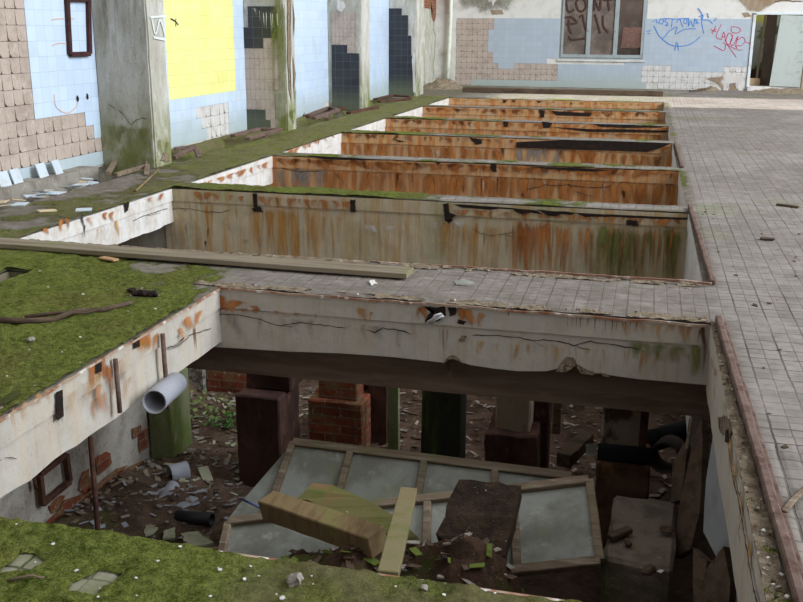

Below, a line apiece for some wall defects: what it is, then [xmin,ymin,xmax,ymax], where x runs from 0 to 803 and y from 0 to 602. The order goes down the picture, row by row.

flaking render [739,0,791,17]
peeling [456,0,558,85]
peeling [0,0,103,172]
peeling [641,65,748,91]
rust [278,99,674,206]
rust [195,162,267,229]
rust [256,197,350,256]
spalling [17,98,702,283]
rust [179,311,202,346]
crack [167,314,343,348]
rust [90,360,112,407]
spalling [0,289,766,602]